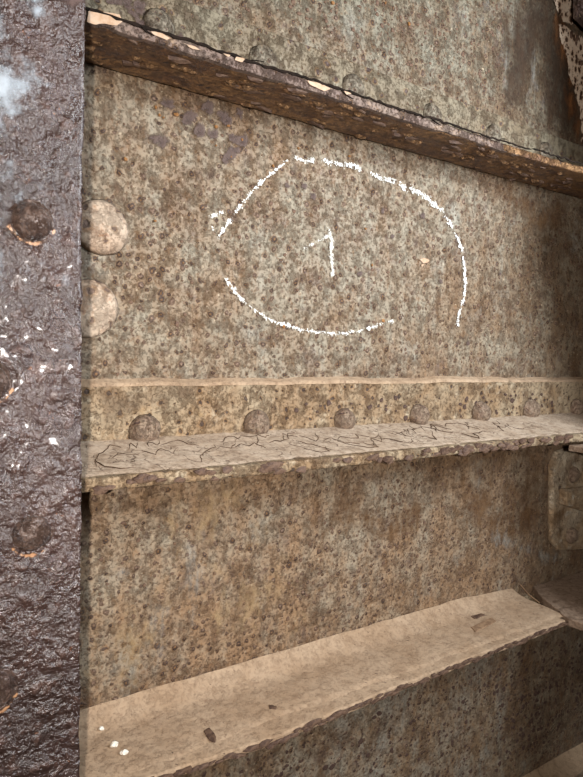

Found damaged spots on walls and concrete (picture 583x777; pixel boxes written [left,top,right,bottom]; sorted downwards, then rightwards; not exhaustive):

efflorescence [0,70,25,114]
peeling [554,0,583,143]
corrosion [149,135,169,149]
corrosion [154,97,248,164]
crack [95,421,534,469]